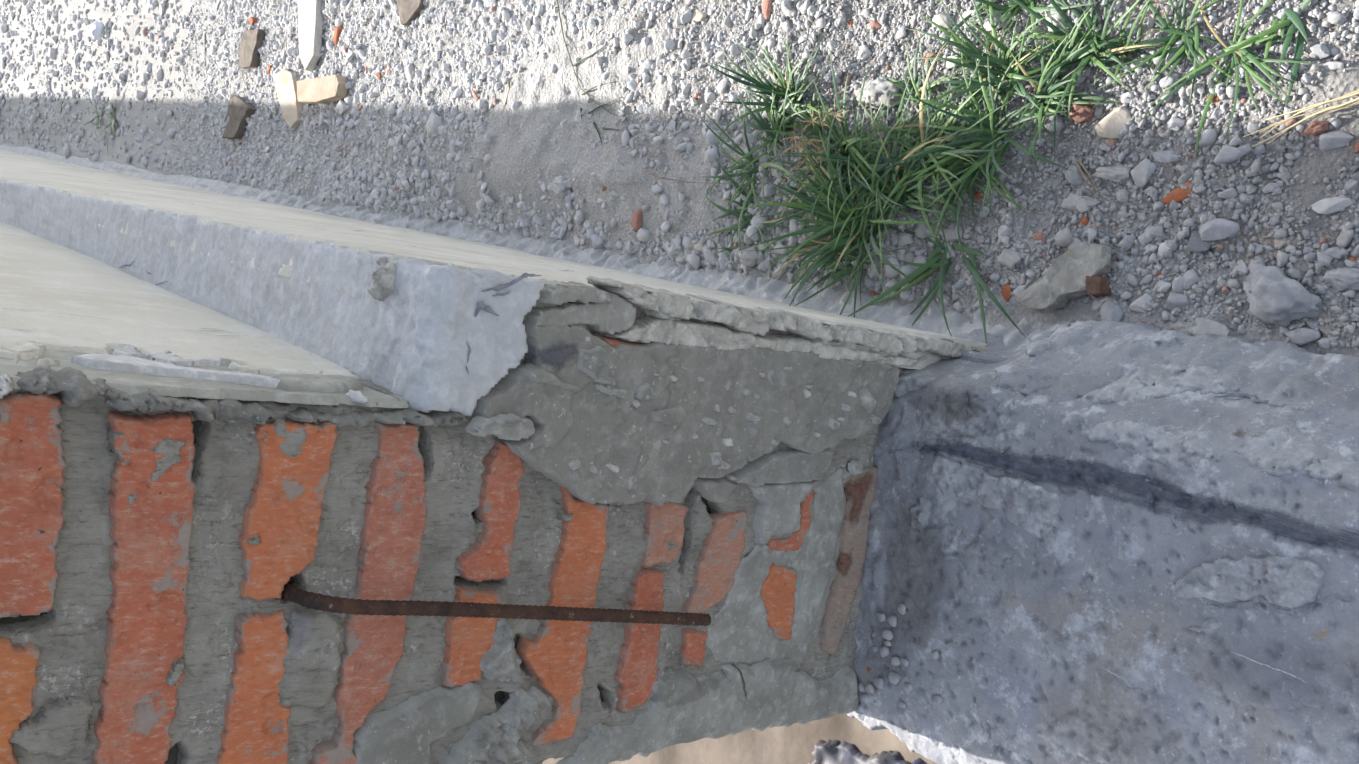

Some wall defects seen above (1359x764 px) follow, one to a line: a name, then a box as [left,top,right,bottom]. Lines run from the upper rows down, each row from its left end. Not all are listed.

peeling [465,413,535,441]
damp [919,442,1359,551]